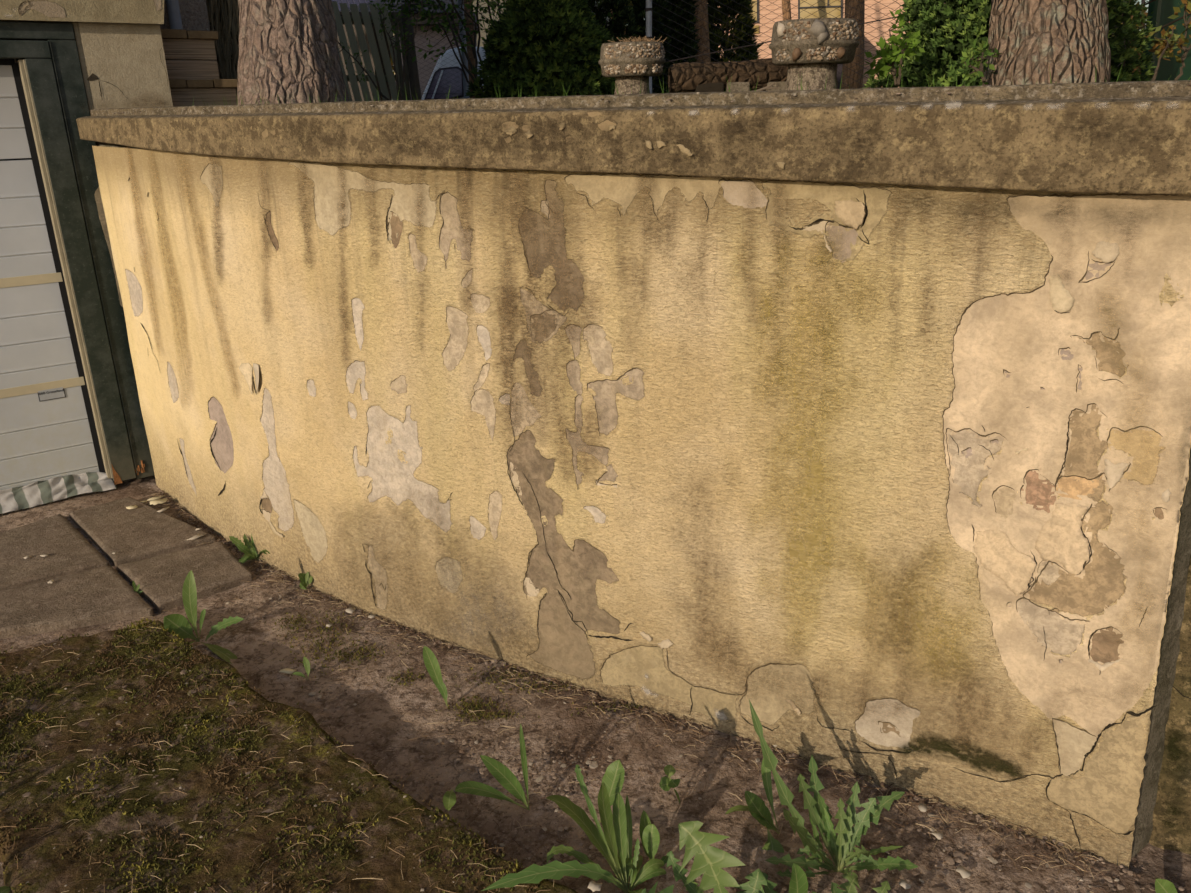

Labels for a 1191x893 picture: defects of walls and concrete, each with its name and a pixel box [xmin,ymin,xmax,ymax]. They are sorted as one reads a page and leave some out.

flaking render [587,111,616,131]
flaking render [645,139,693,157]
damp [499,241,528,407]
peeling [208,397,234,473]
peeling [239,363,328,563]
peeling [288,157,892,731]
peeling [942,193,1191,776]
crack [817,719,897,779]
flaking render [855,698,921,754]
crack [953,686,1191,850]